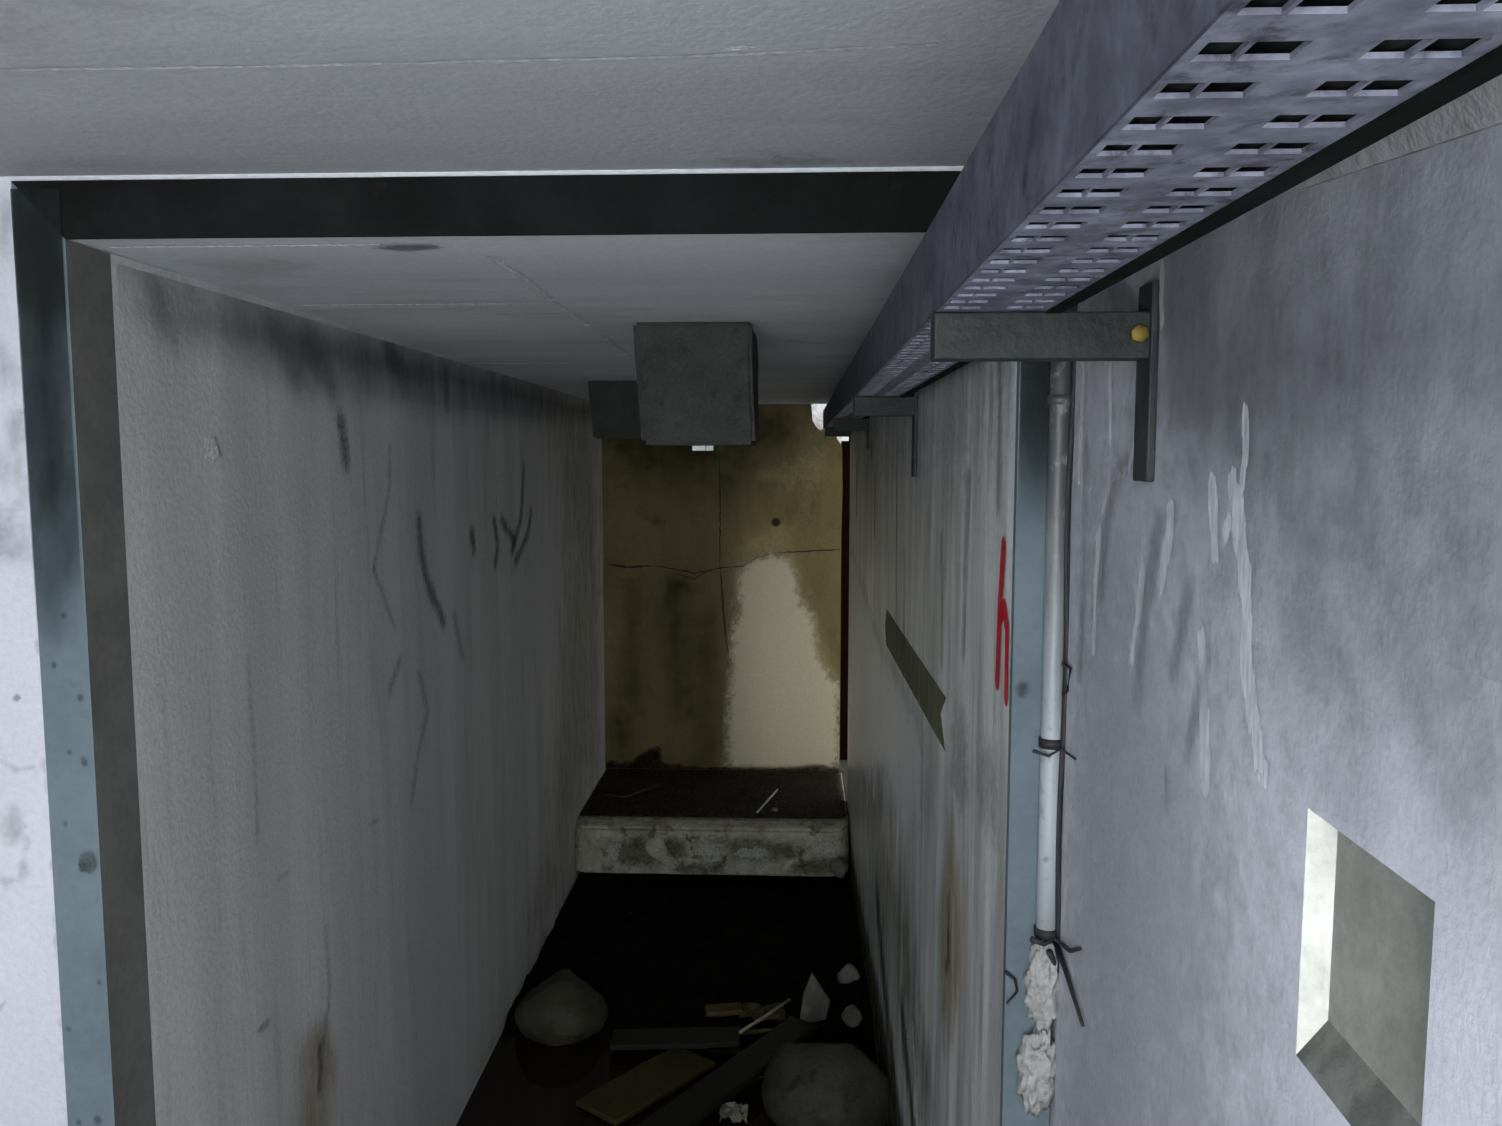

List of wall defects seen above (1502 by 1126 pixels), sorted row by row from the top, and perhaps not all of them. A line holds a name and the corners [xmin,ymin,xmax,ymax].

crack [607,458,840,656]